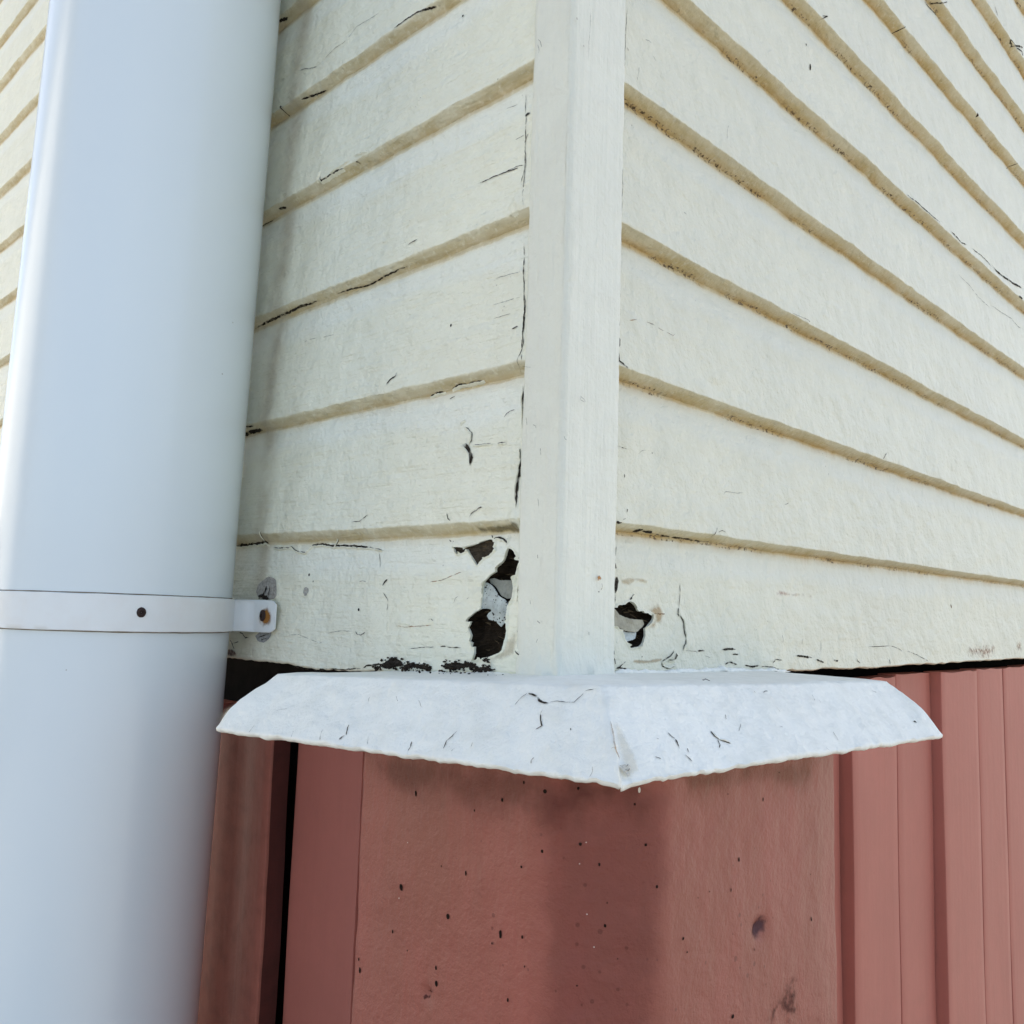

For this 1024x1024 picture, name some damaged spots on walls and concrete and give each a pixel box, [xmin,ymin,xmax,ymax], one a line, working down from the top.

crack [430,380,541,506]
peeling [451,537,519,664]
peeling [614,599,654,650]
crack [658,600,924,692]
crack [516,689,592,729]